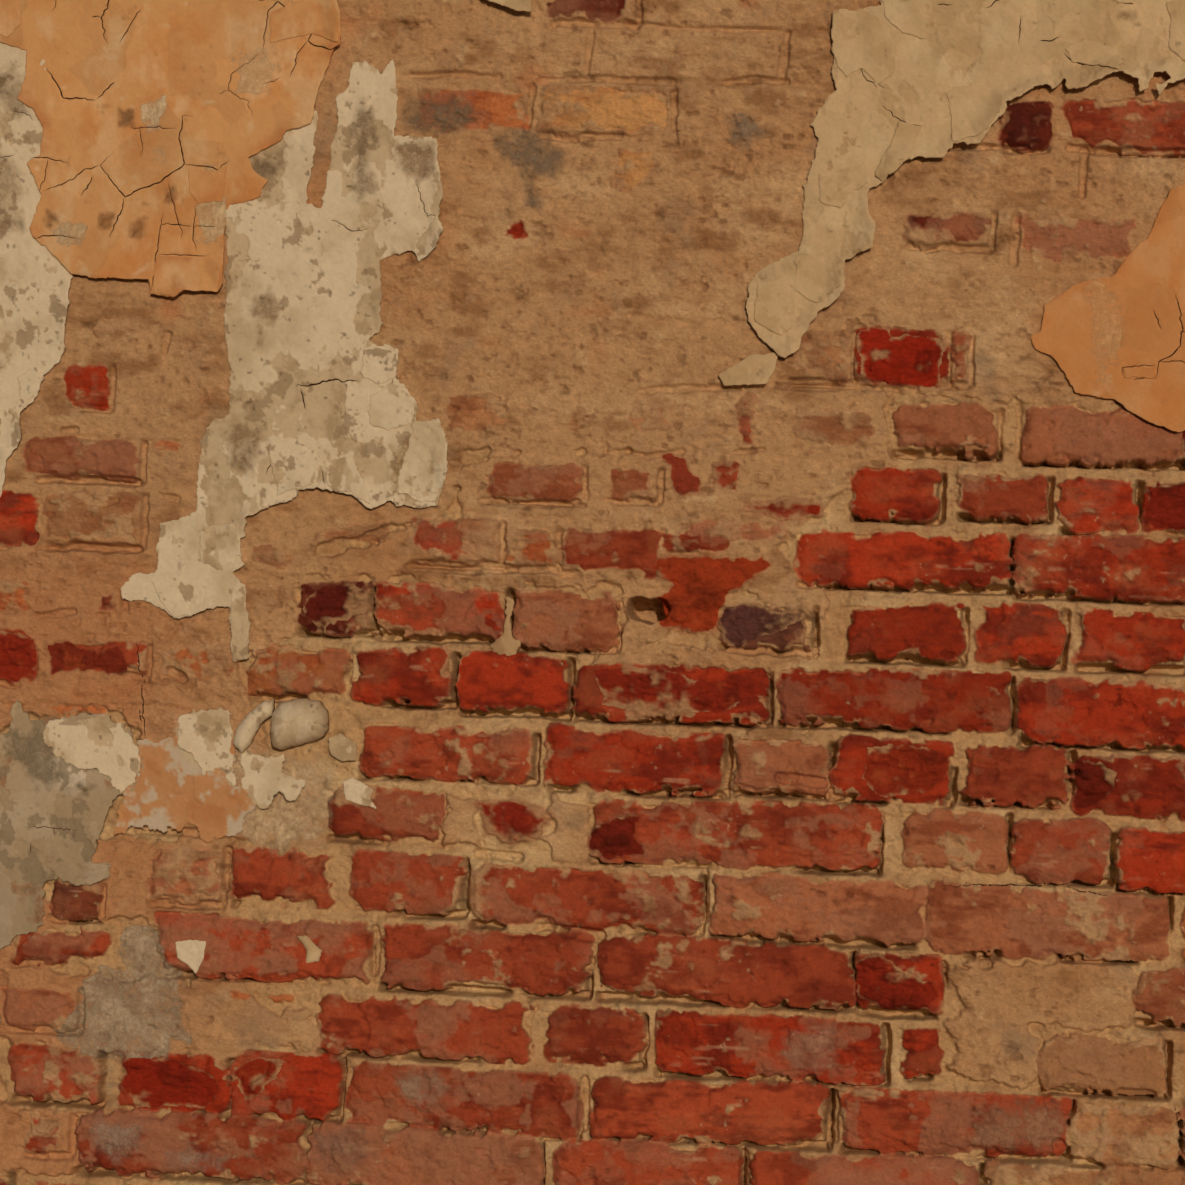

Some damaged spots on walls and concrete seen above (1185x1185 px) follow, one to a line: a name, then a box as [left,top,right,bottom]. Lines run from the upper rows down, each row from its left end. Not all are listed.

crack [47,70,114,100]
crack [54,0,140,42]
crack [220,0,336,115]
crack [1018,18,1105,65]
crack [0,115,228,290]
peeling [718,0,1185,387]
peeling [0,0,448,662]
peeling [1031,184,1185,458]
crack [1122,295,1185,380]
spalling [1145,482,1185,531]
peeling [0,699,306,950]
peeling [175,940,206,974]